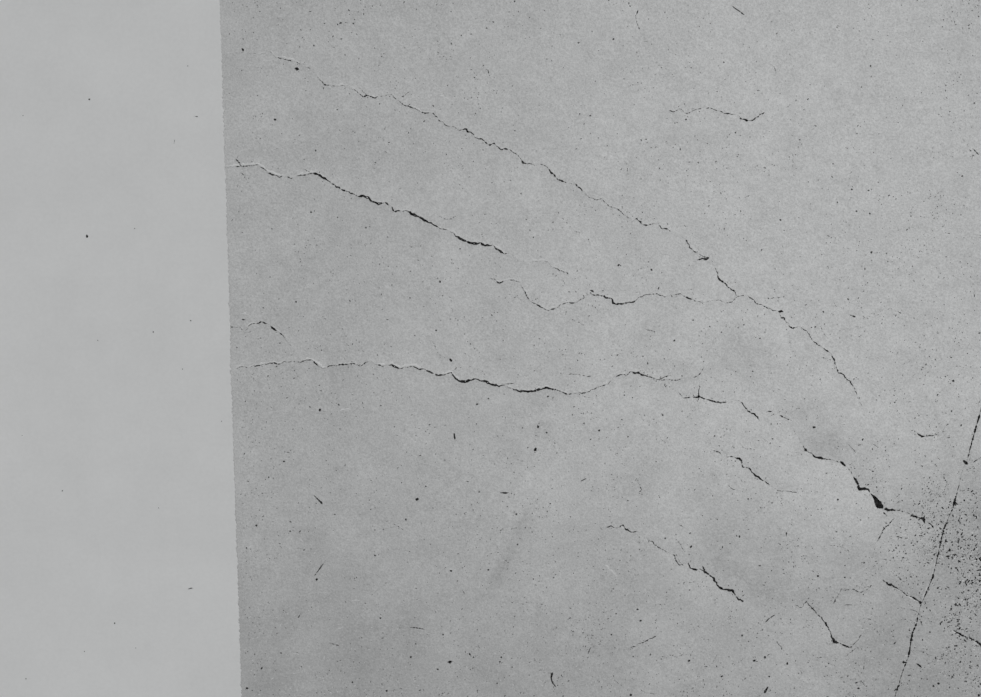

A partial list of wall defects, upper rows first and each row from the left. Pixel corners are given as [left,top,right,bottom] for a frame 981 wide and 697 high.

crack [225,50,862,405]
crack [236,357,789,420]
crack [714,450,797,493]
crack [803,446,933,539]
crack [600,525,744,602]
crack [796,580,922,653]
crack [953,630,981,647]